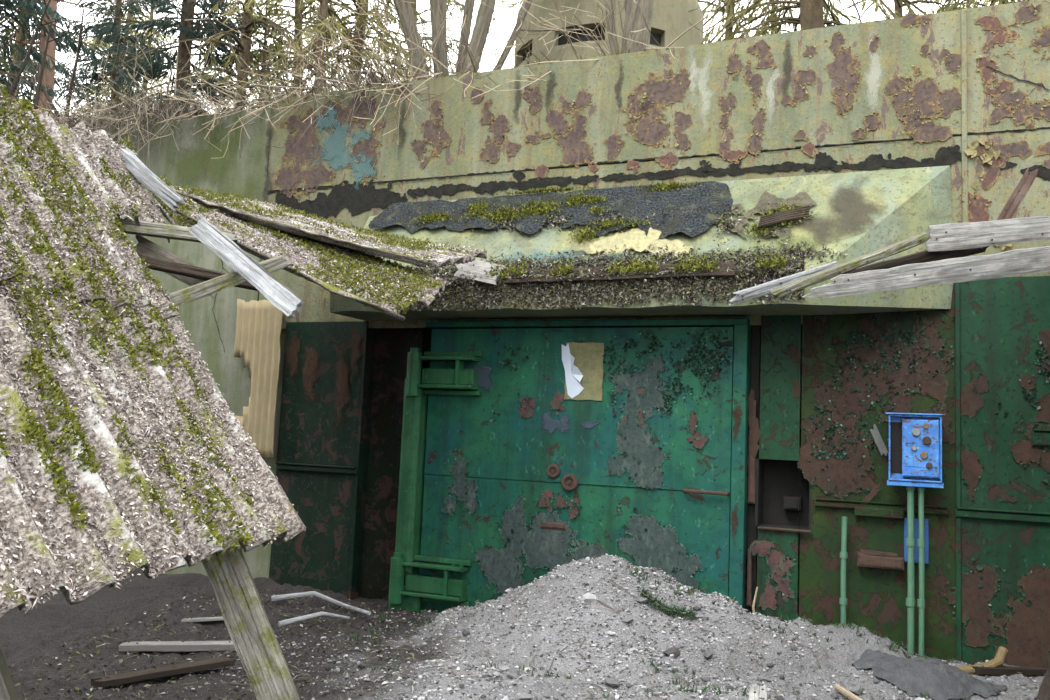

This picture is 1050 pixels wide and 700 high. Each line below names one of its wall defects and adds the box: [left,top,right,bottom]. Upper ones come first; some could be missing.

crack [268,153,719,194]
corrosion [470,68,695,173]
corrosion [718,38,779,164]
corrosion [781,30,880,115]
crack [747,138,914,152]
corrosion [884,3,1050,223]
crack [952,127,1050,135]
crack [986,66,1049,99]
peeling [514,385,536,428]
peeling [603,325,734,490]
peeling [440,449,479,515]
peeling [475,490,707,596]